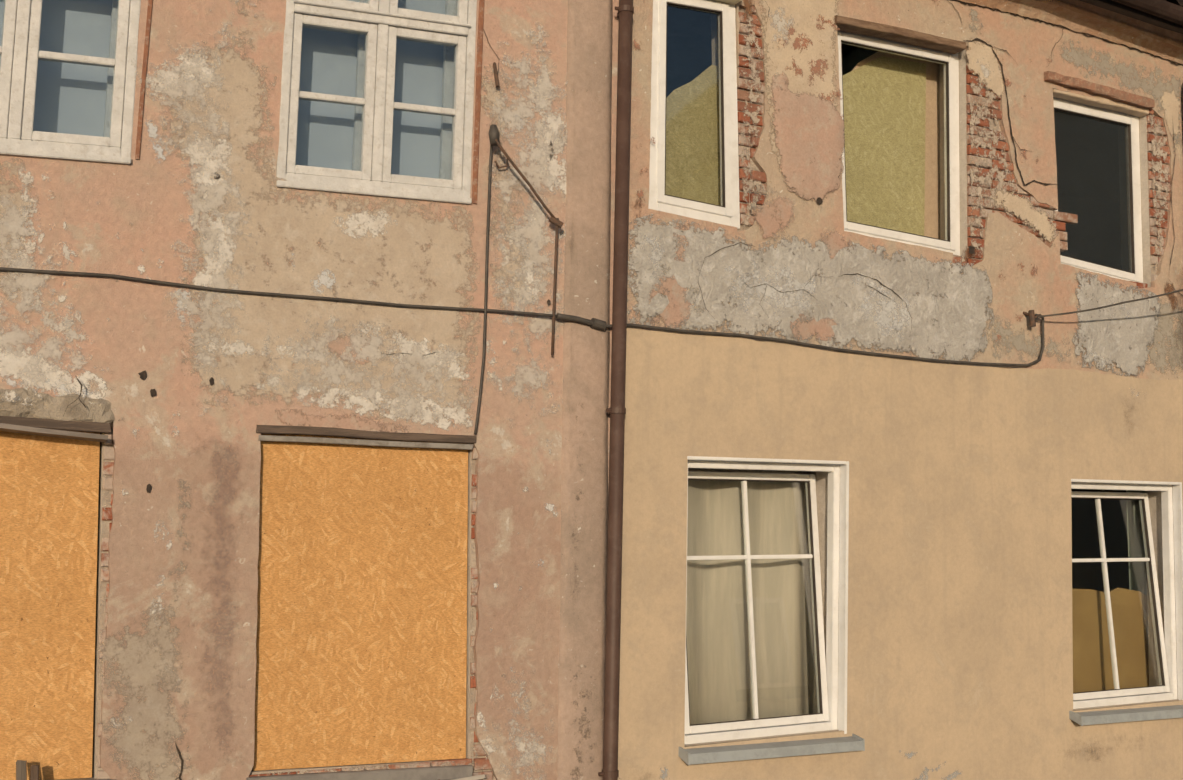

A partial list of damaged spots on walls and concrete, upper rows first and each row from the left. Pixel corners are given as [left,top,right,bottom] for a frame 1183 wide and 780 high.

peeling [0,158,107,405]
flaking render [136,24,567,433]
peeling [725,262,837,341]
flaking render [737,0,845,239]
spalling [952,9,1078,267]
crack [947,0,1183,186]
flaking render [1047,41,1183,289]
flaking render [97,420,192,780]
crack [175,742,184,780]